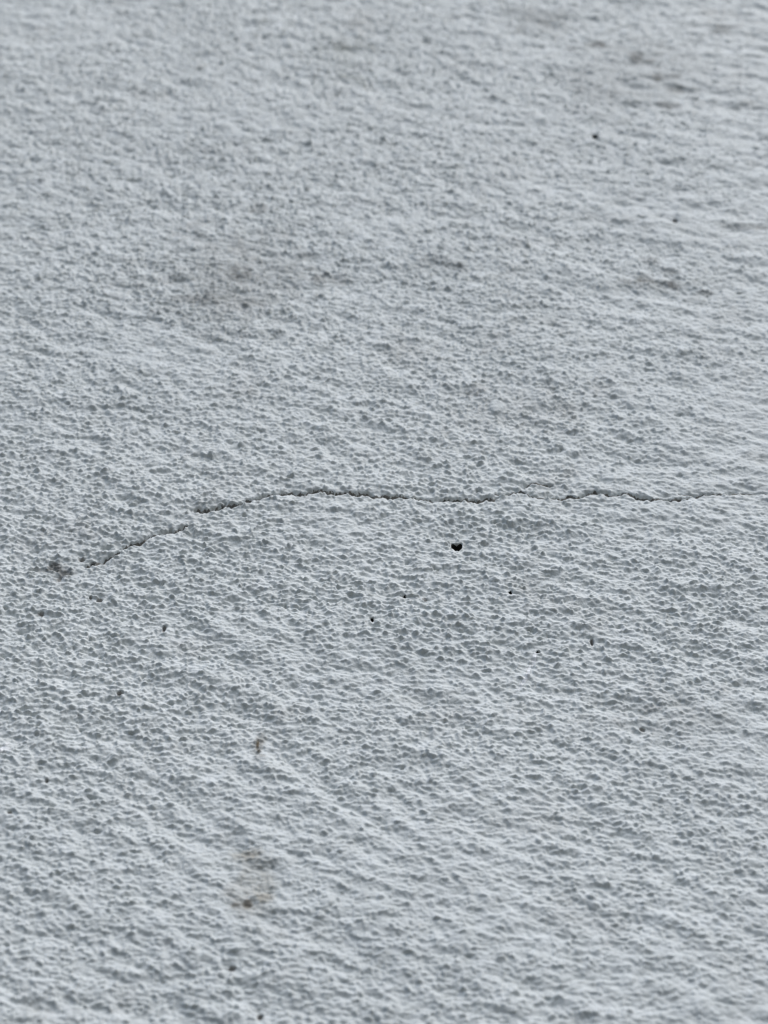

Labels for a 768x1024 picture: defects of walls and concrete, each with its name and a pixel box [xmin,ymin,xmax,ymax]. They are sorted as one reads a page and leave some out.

crack [87,483,767,568]